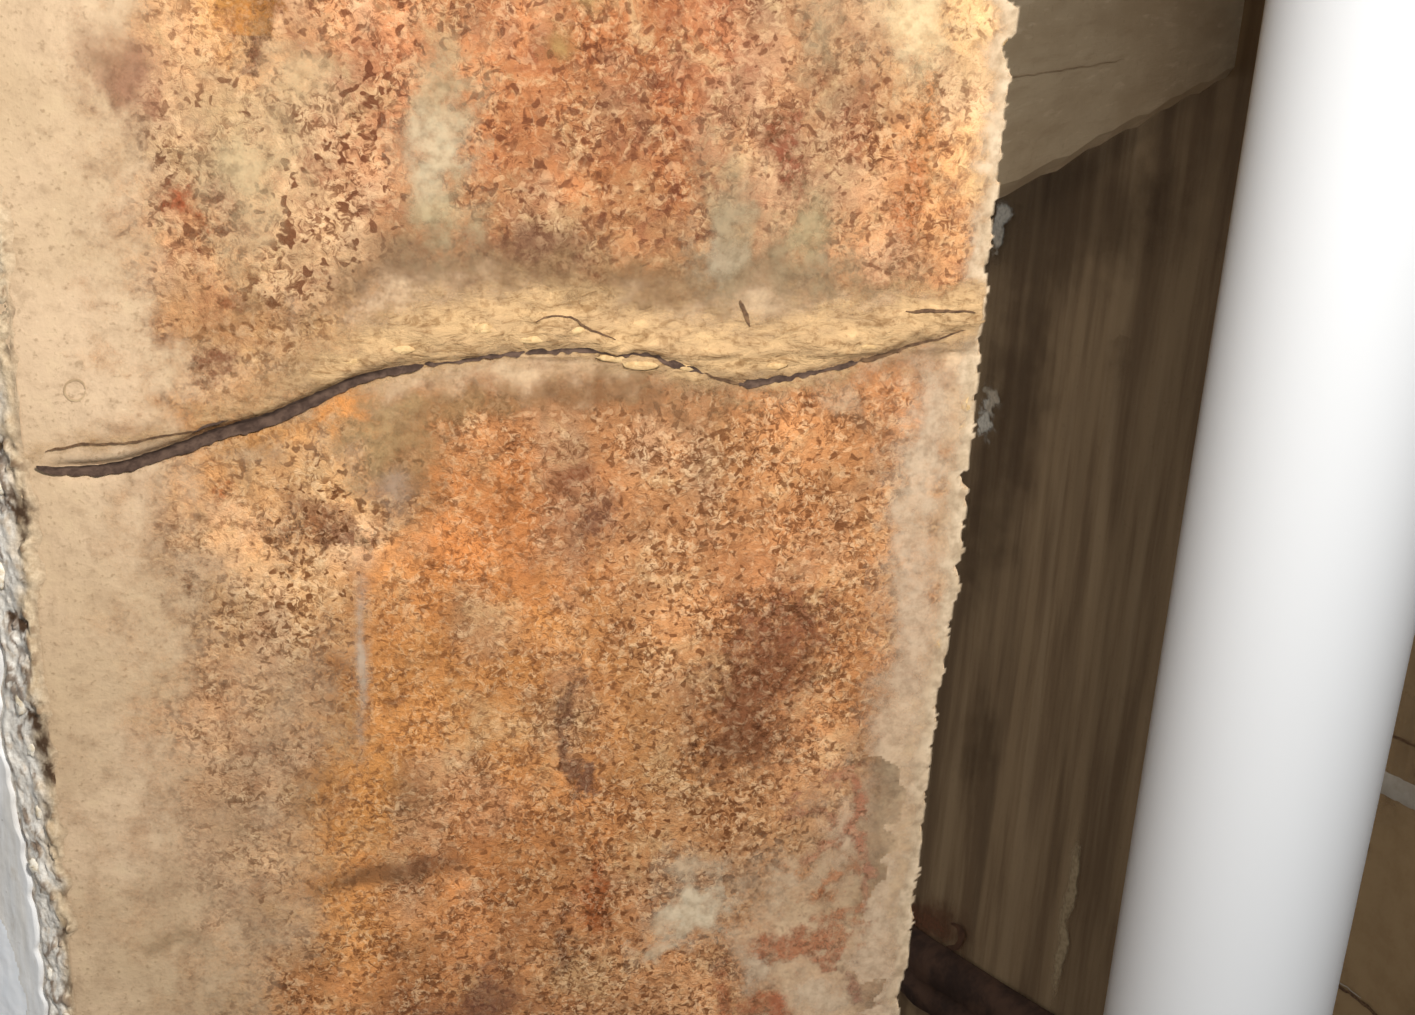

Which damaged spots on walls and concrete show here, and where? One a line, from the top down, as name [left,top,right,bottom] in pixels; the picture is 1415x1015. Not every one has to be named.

crack [36,309,976,477]
crack [740,300,750,327]
spalling [0,184,78,1015]
corrosion [104,0,1008,1015]
leakage [685,578,836,785]
leakage [874,378,944,786]
leakage [645,888,714,958]
leakage [856,863,892,1015]